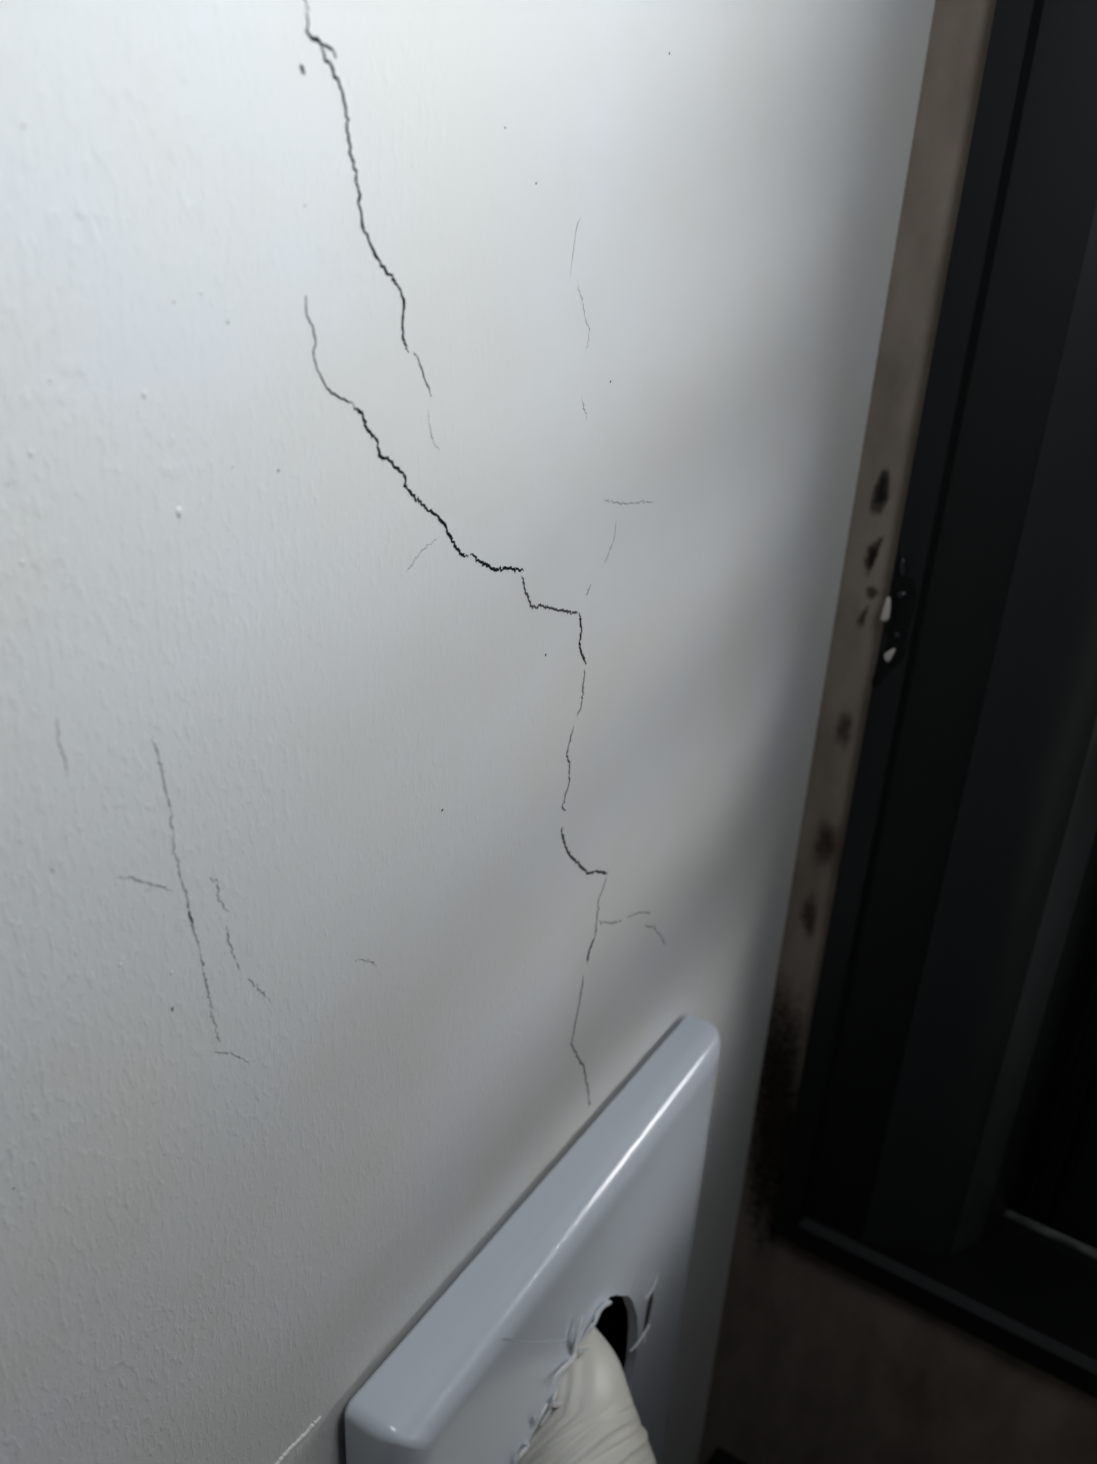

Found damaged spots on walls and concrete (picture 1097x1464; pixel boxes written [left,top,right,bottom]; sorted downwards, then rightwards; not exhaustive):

crack [305,0,432,396]
crack [305,296,607,1104]